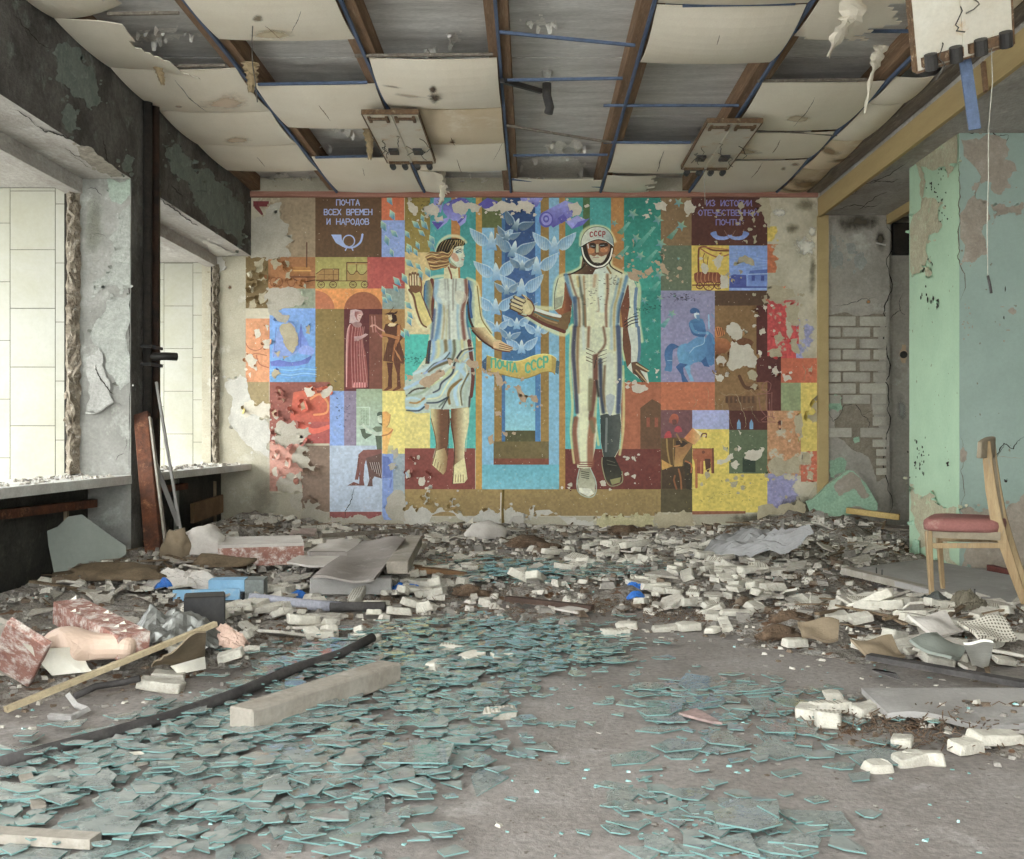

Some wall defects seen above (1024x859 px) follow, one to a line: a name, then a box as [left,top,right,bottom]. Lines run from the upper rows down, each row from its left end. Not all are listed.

peeling [519,14,557,35]
spalling [47,42,135,475]
peeling [162,133,703,529]
peeling [712,280,805,392]
peeling [700,412,817,494]
peeling [757,495,806,520]
flaking render [829,312,886,510]
crack [829,166,905,522]
peeling [905,133,1024,308]